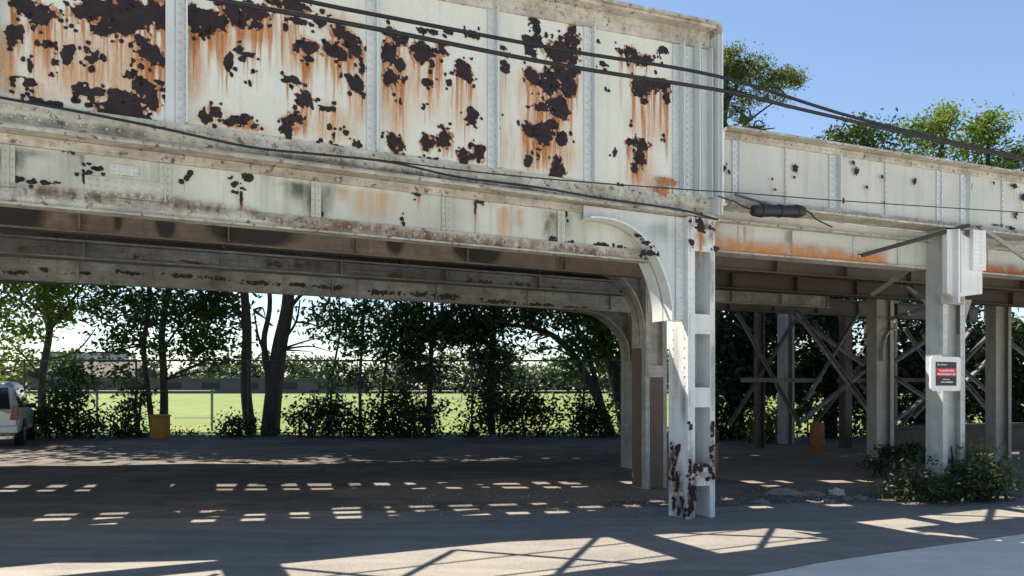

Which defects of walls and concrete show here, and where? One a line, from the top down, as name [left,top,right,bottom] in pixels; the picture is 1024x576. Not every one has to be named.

peeling [3,0,165,120]
rust [246,21,268,40]
peeling [188,0,367,149]
peeling [381,20,487,165]
peeling [500,17,582,178]
peeling [609,41,673,187]
rust [161,197,221,211]
peeling [228,173,254,210]
rust [653,177,678,196]
rust [703,223,884,264]
rust [982,266,1024,275]
peeling [668,421,716,519]